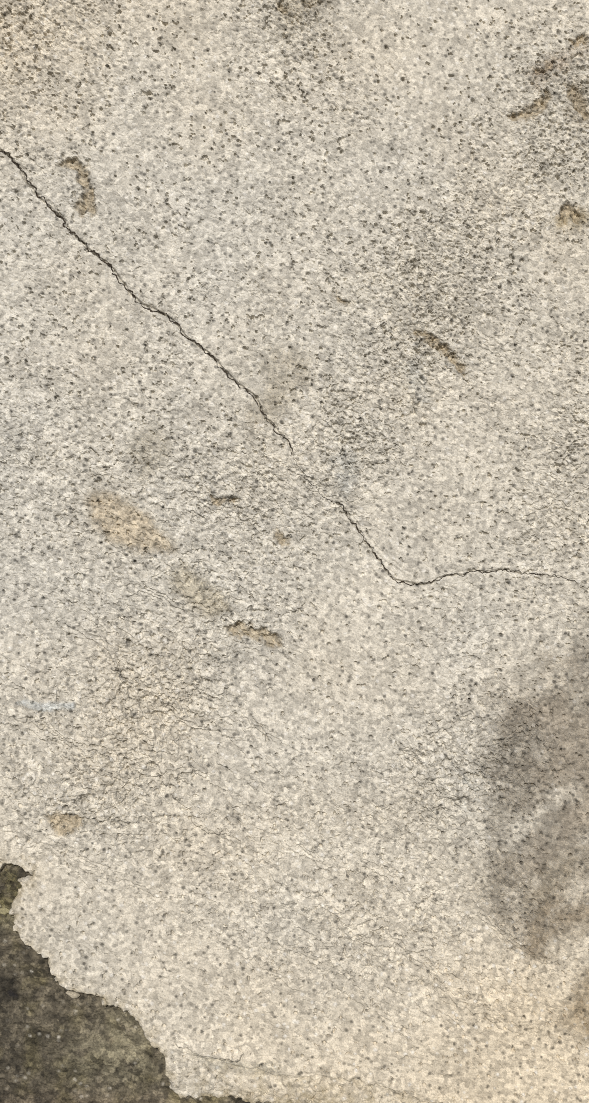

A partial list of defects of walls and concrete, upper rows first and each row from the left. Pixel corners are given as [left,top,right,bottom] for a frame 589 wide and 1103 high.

crack [0,151,576,586]
spalling [0,863,185,1103]
peeling [174,1031,244,1063]